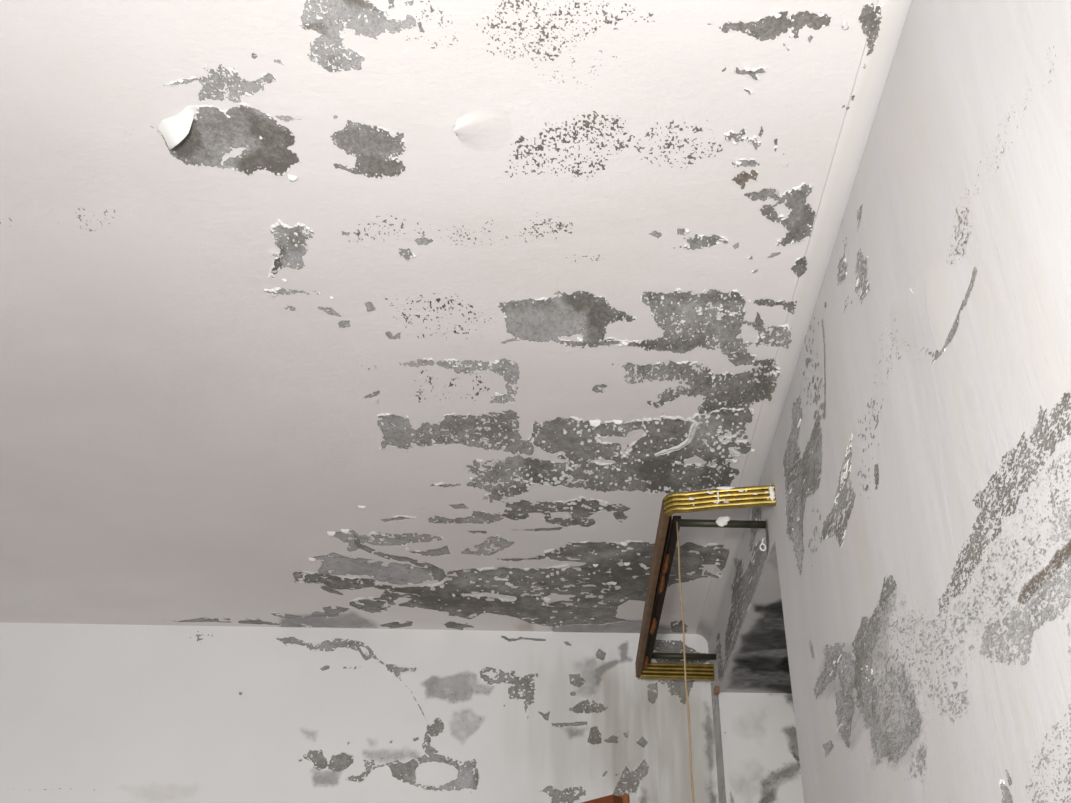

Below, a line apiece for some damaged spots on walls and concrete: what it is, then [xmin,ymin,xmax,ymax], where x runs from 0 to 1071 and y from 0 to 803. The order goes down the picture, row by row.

peeling [300,0,424,73]
peeling [708,2,885,68]
peeling [157,60,299,181]
peeling [264,219,350,328]
peeling [331,115,406,179]
peeling [676,229,739,251]
peeling [723,127,816,258]
peeling [791,257,807,277]
peeling [293,288,797,628]
peeling [783,317,882,575]
peeling [809,391,1071,782]
peeling [299,717,480,792]